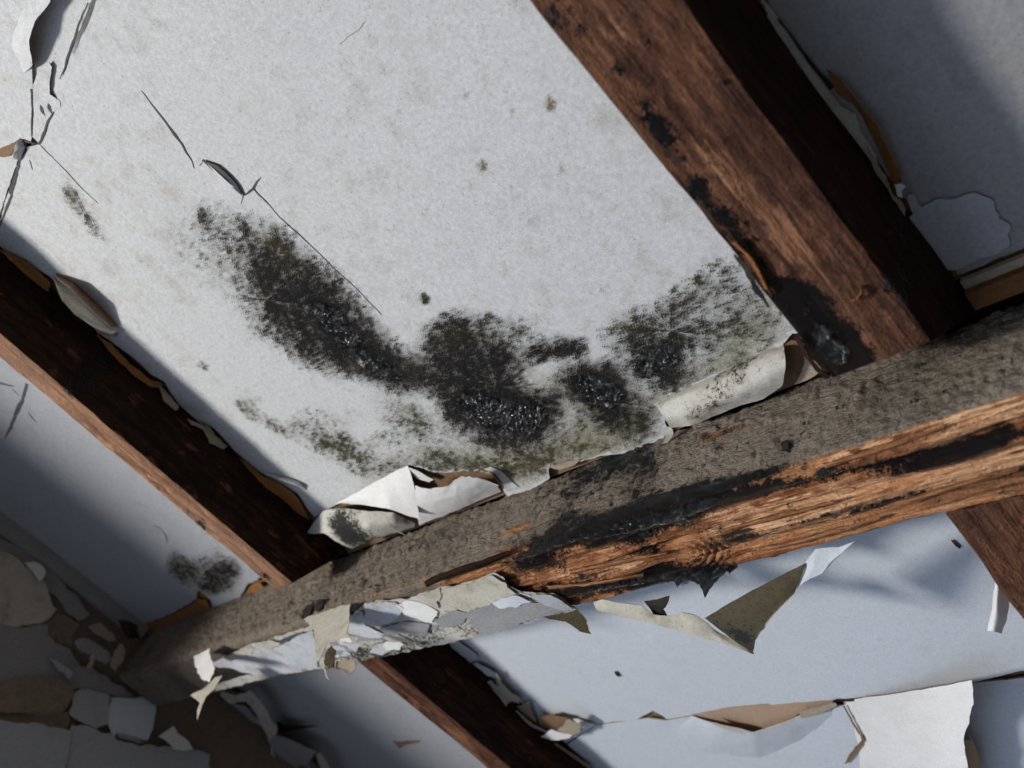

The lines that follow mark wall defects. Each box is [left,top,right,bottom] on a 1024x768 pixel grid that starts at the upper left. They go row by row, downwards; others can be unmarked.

crack [0,142,98,226]
crack [142,92,380,313]
leakage [170,200,781,483]
peeling [0,539,210,768]
mould [165,551,242,596]
peeling [210,572,578,691]